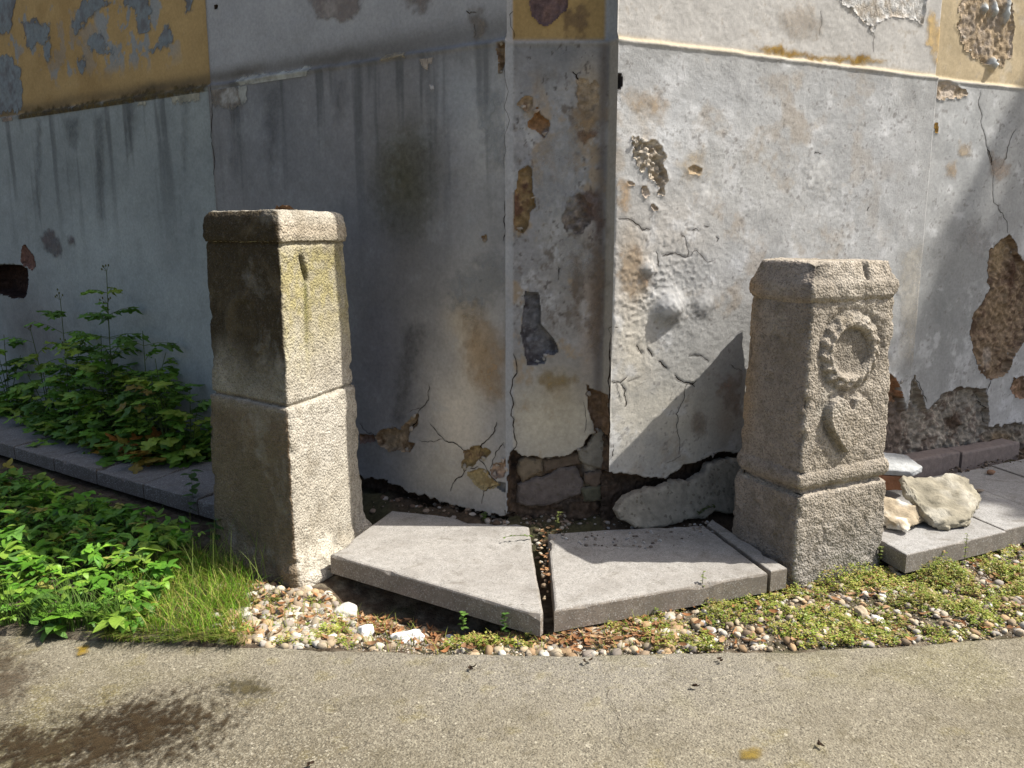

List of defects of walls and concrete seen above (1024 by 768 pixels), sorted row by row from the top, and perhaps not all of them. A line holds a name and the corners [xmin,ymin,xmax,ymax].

peeling [957,0,1016,67]
flaking render [517,96,550,138]
flaking render [514,165,536,233]
flaking render [627,136,669,211]
crack [978,94,1015,233]
spalling [0,245,36,299]
crack [619,218,719,266]
flaking render [520,291,558,365]
flaking render [888,235,1024,455]
crack [409,354,517,504]
flaking render [359,385,738,521]
crack [585,327,707,461]